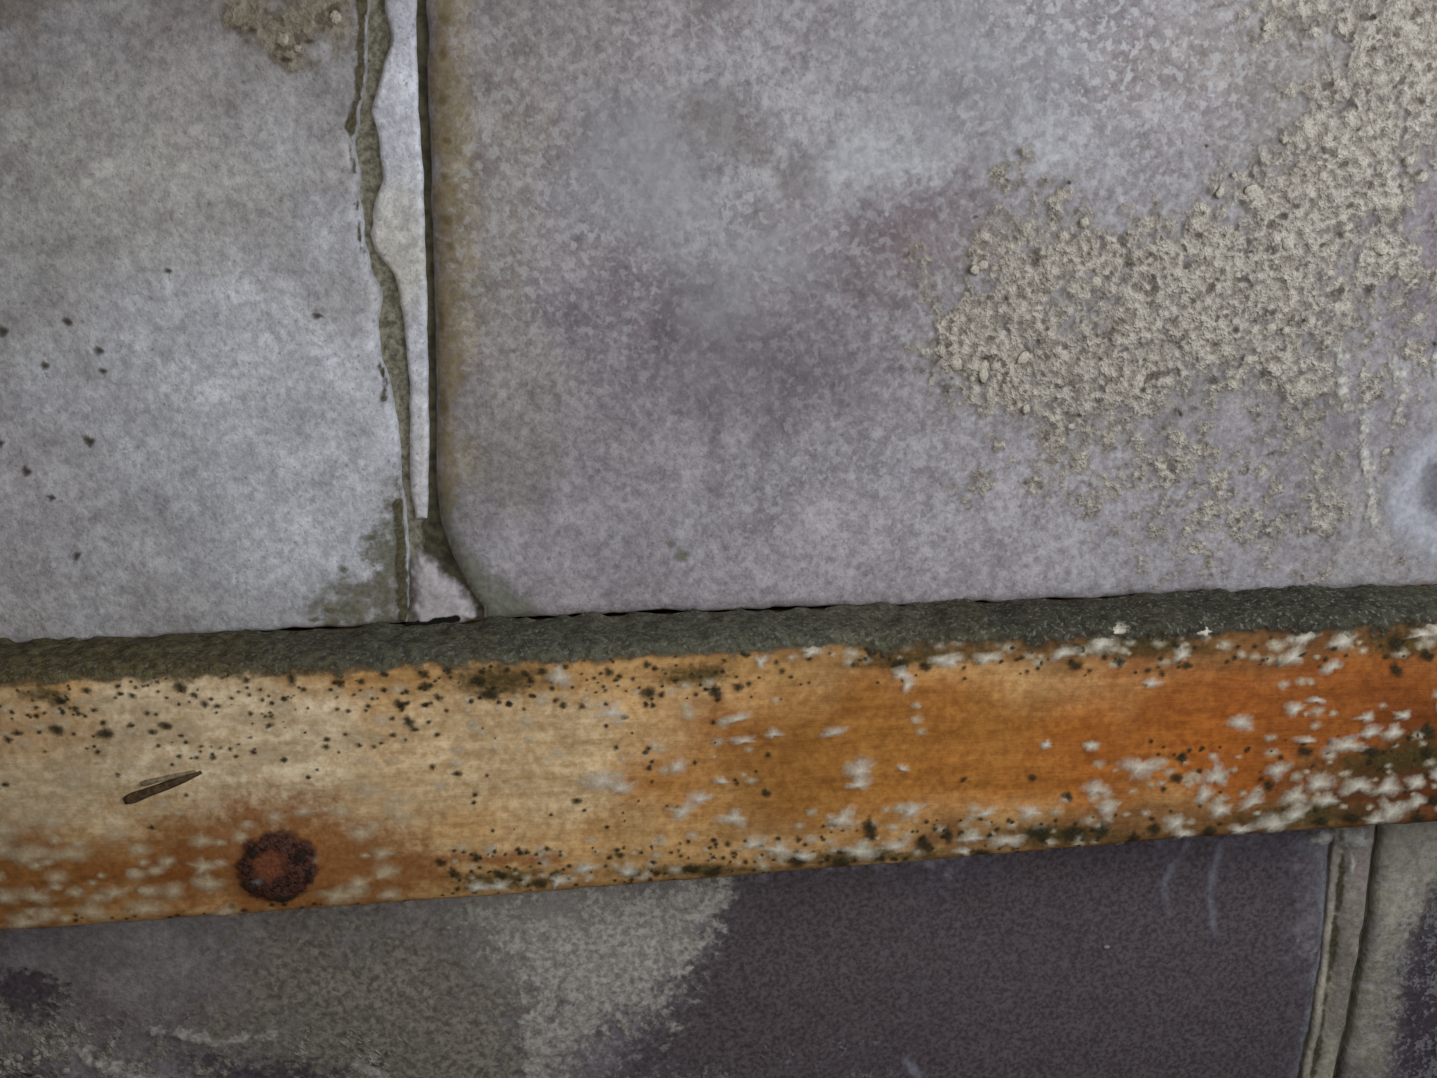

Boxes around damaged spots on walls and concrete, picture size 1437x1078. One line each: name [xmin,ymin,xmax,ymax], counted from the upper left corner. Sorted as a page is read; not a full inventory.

corrosion [81,801,558,912]
water stain [0,621,1437,1078]